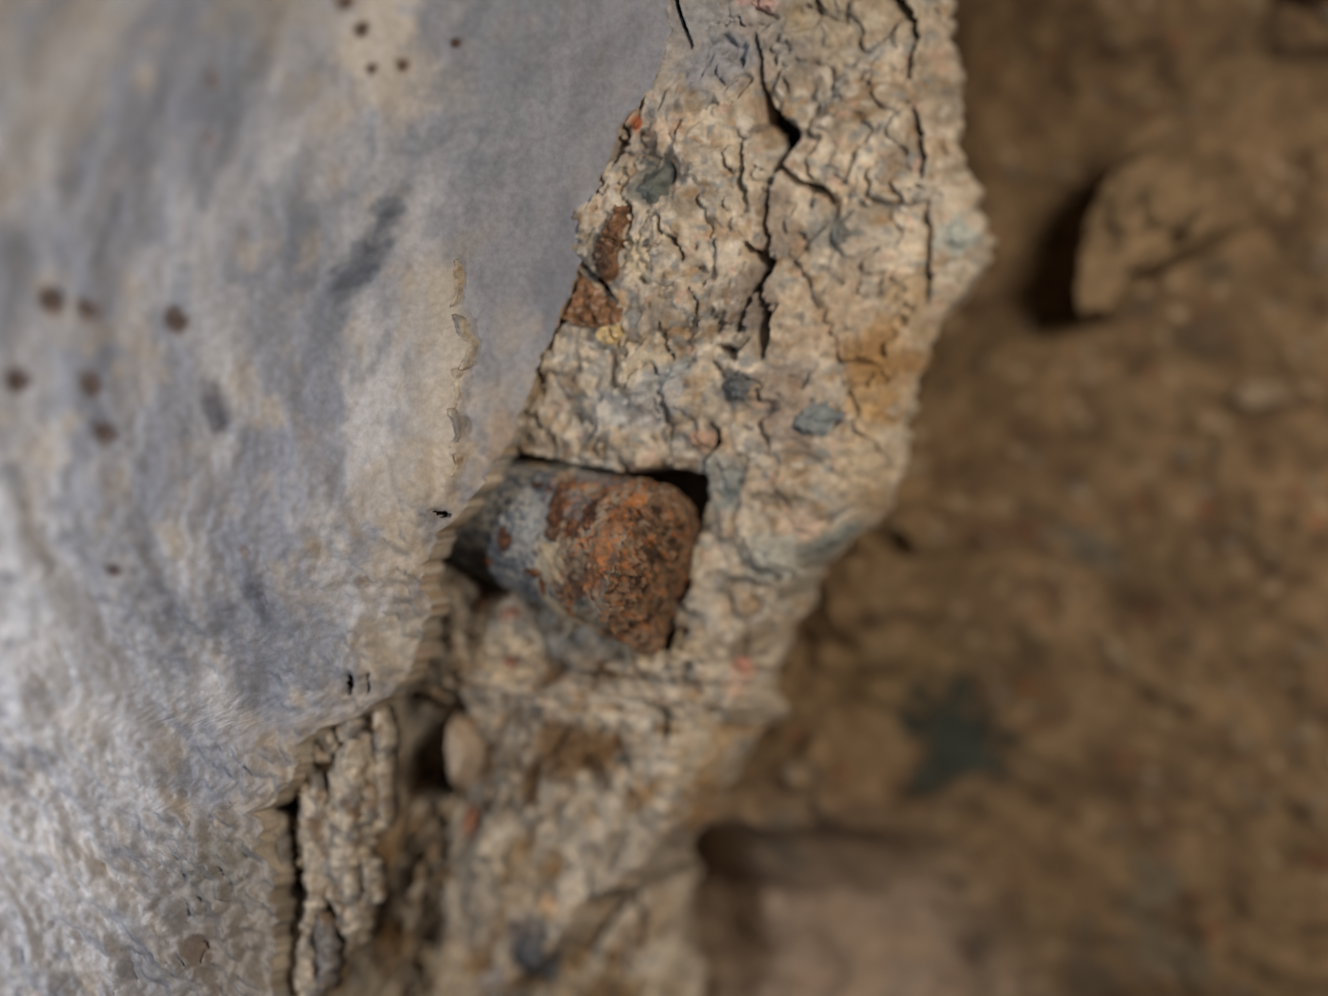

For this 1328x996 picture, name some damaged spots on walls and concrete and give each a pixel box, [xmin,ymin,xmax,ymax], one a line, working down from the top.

crack [773,102,831,192]
crack [766,312,774,340]
spalling [270,0,998,996]
crack [433,510,452,518]
crack [347,675,371,693]